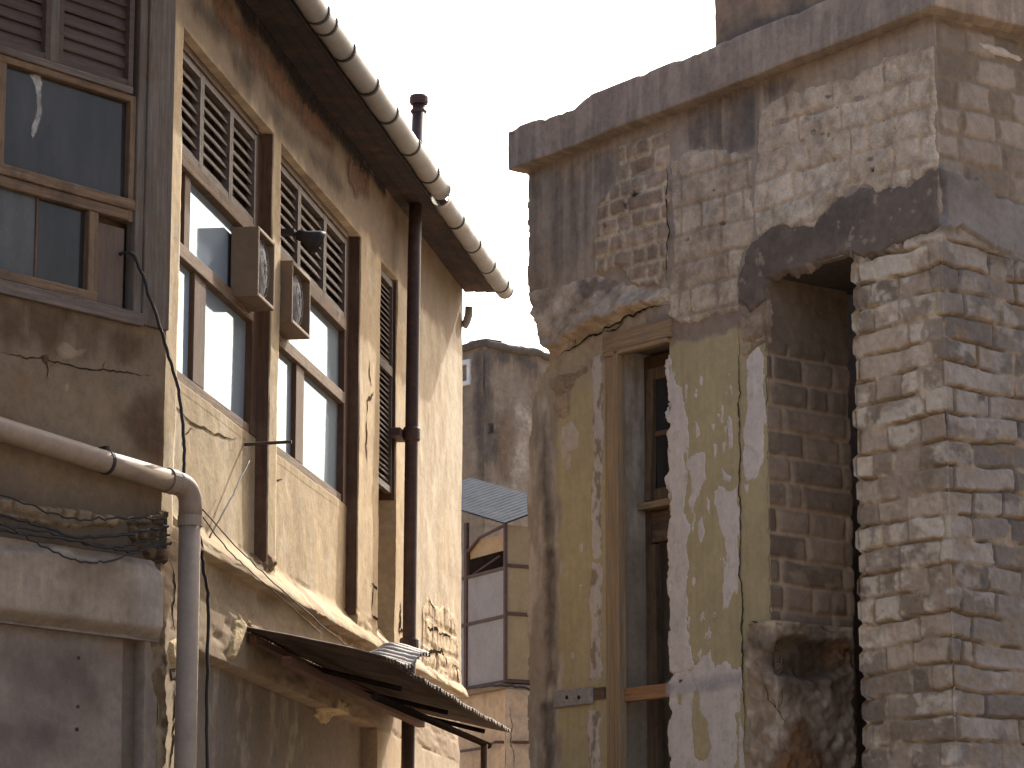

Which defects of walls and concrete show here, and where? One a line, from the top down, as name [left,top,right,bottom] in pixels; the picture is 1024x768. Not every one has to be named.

crack [555,162,670,359]
crack [0,352,154,379]
crack [176,407,236,440]
spalling [593,46,939,768]
peeling [548,353,605,681]
flaking render [421,597,467,697]
peeling [586,710,601,768]